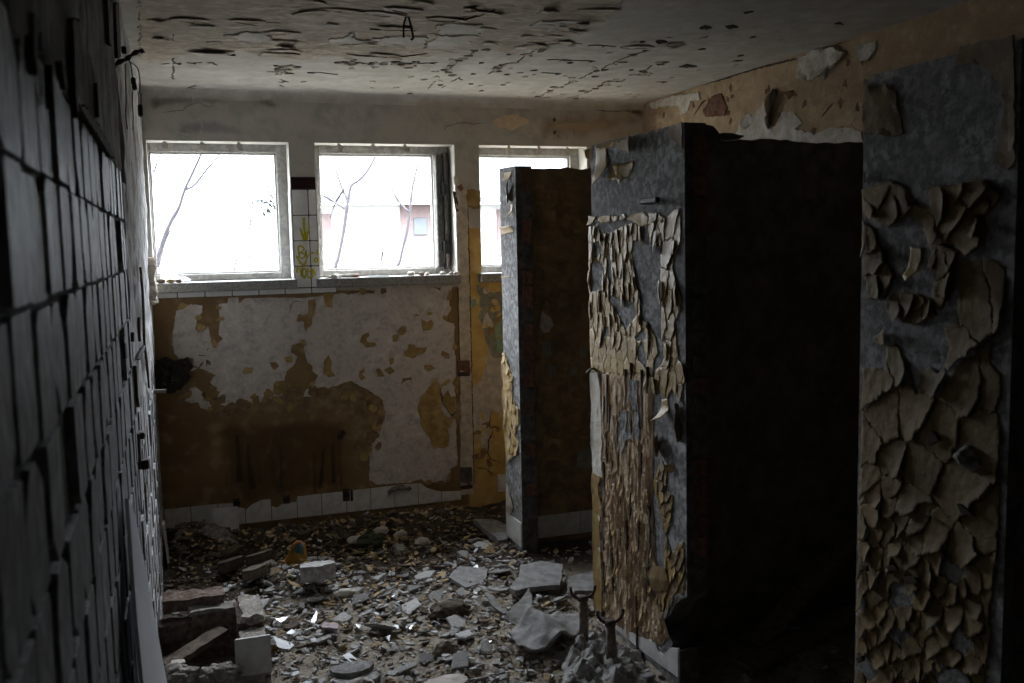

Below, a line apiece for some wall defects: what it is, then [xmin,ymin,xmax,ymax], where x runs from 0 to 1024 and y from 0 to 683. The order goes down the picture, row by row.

peeling [647,41,904,149]
peeling [956,35,1017,170]
peeling [155,284,459,488]
peeling [471,167,556,521]
flaking render [569,208,686,650]
peeling [855,172,1006,683]